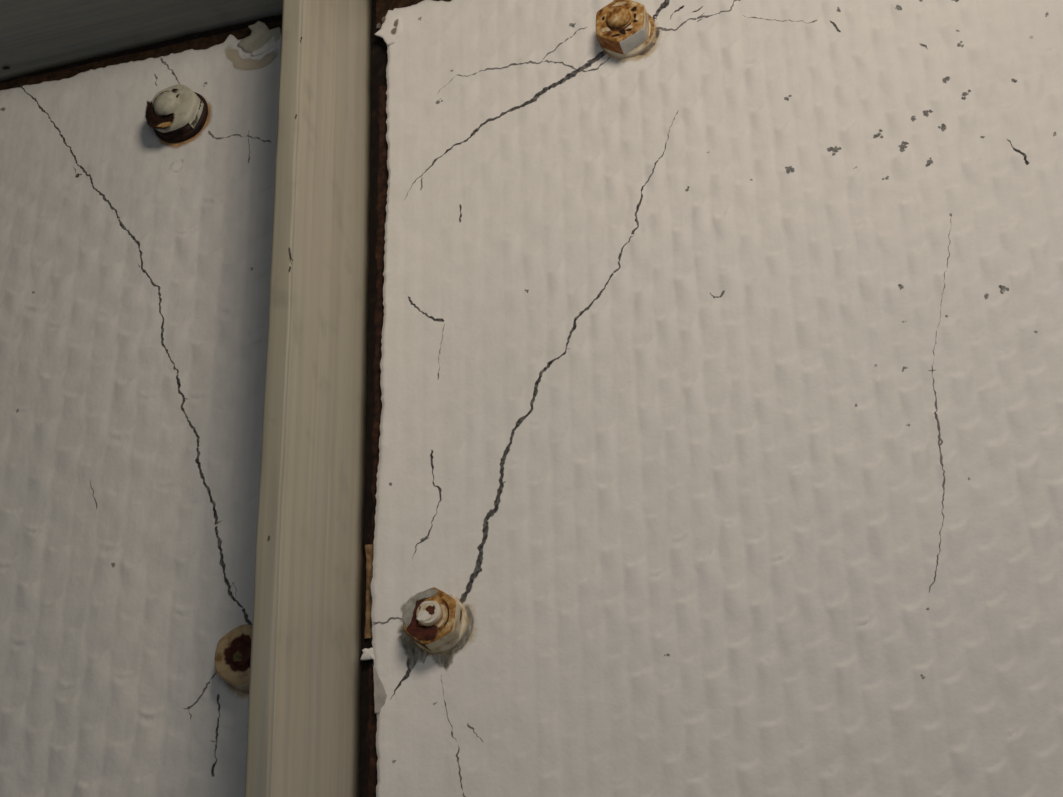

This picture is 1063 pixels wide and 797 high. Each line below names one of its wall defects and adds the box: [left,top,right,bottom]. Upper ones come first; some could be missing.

peeling [237,21,281,56]
rust [602,6,659,60]
crack [652,0,841,32]
rust [145,89,210,147]
crack [405,26,610,198]
crack [21,86,252,625]
crack [408,296,445,379]
crack [460,112,678,603]
crack [929,216,952,592]
crack [412,450,442,558]
rust [224,634,251,671]
rust [406,599,473,654]